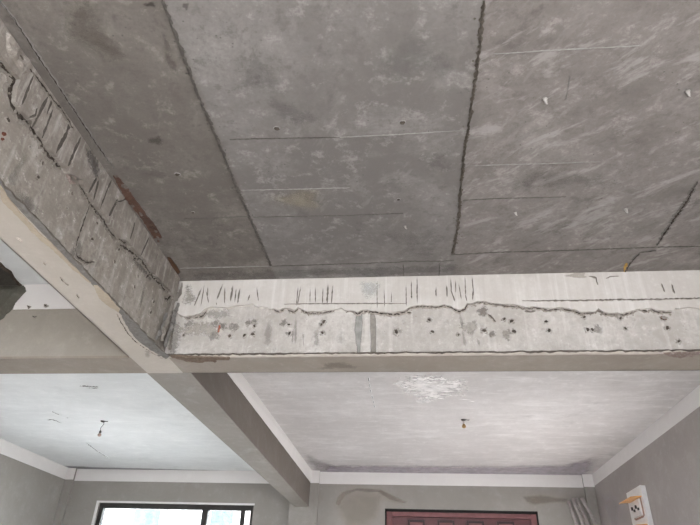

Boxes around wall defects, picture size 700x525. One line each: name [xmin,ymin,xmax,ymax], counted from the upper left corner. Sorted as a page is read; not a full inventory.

spalling [29,96,54,139]
crack [0,0,114,170]
spalling [55,122,81,167]
crack [74,185,171,303]
spalling [0,175,700,363]
crack [272,181,700,322]